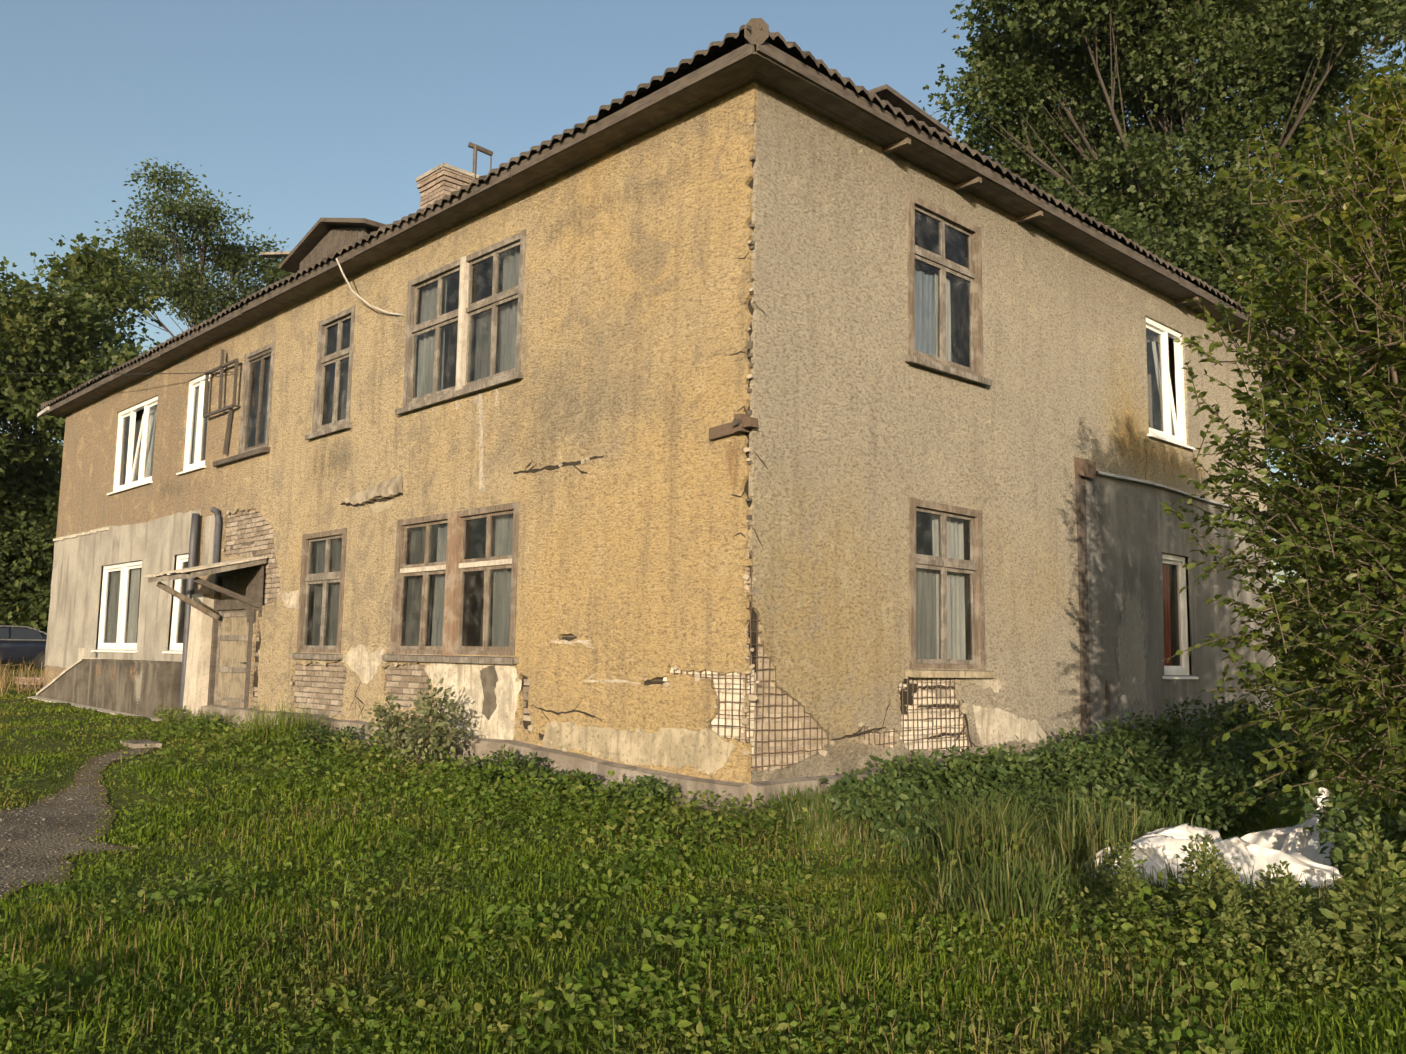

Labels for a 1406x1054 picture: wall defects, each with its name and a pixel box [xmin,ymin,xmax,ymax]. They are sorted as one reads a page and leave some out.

crack [728,122,768,672]
crack [513,456,603,474]
spalling [220,509,280,626]
spalling [289,660,347,718]
spalling [368,646,429,710]
crack [531,639,641,721]
spalling [643,549,834,772]